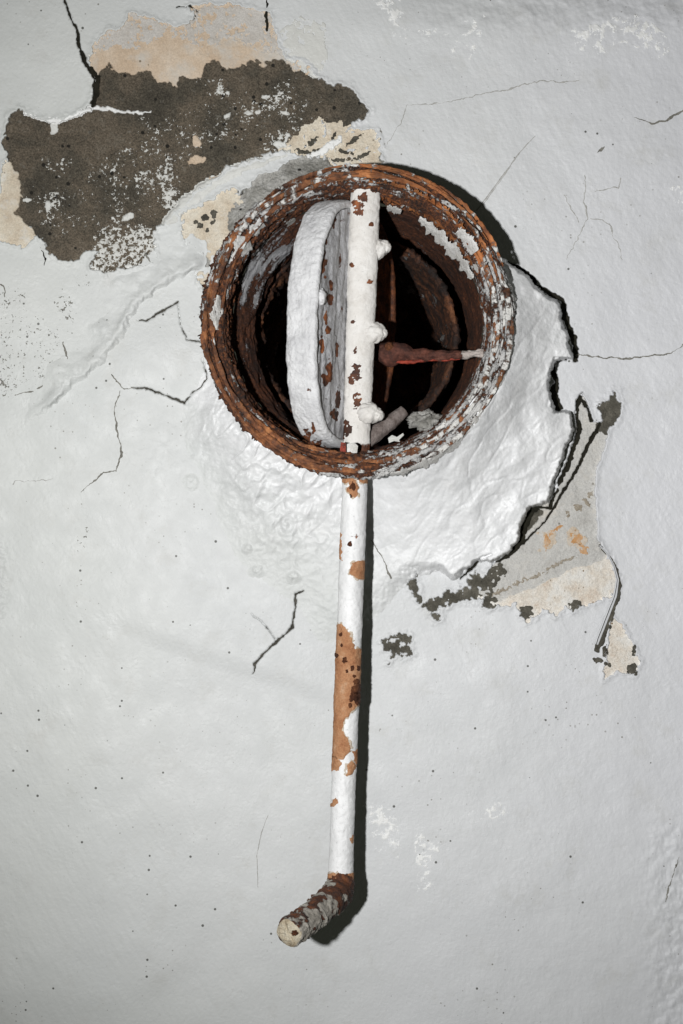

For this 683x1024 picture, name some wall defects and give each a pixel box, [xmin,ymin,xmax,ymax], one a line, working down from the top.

crack [64,0,100,108]
spalling [0,2,381,288]
crack [378,80,579,166]
crack [634,110,683,125]
corrosion [198,163,514,499]
crack [81,301,208,492]
peeling [390,402,486,477]
corrosion [339,533,365,581]
spalling [407,392,640,679]
crack [253,590,304,674]
corrosion [331,622,362,776]
spalling [381,633,413,665]